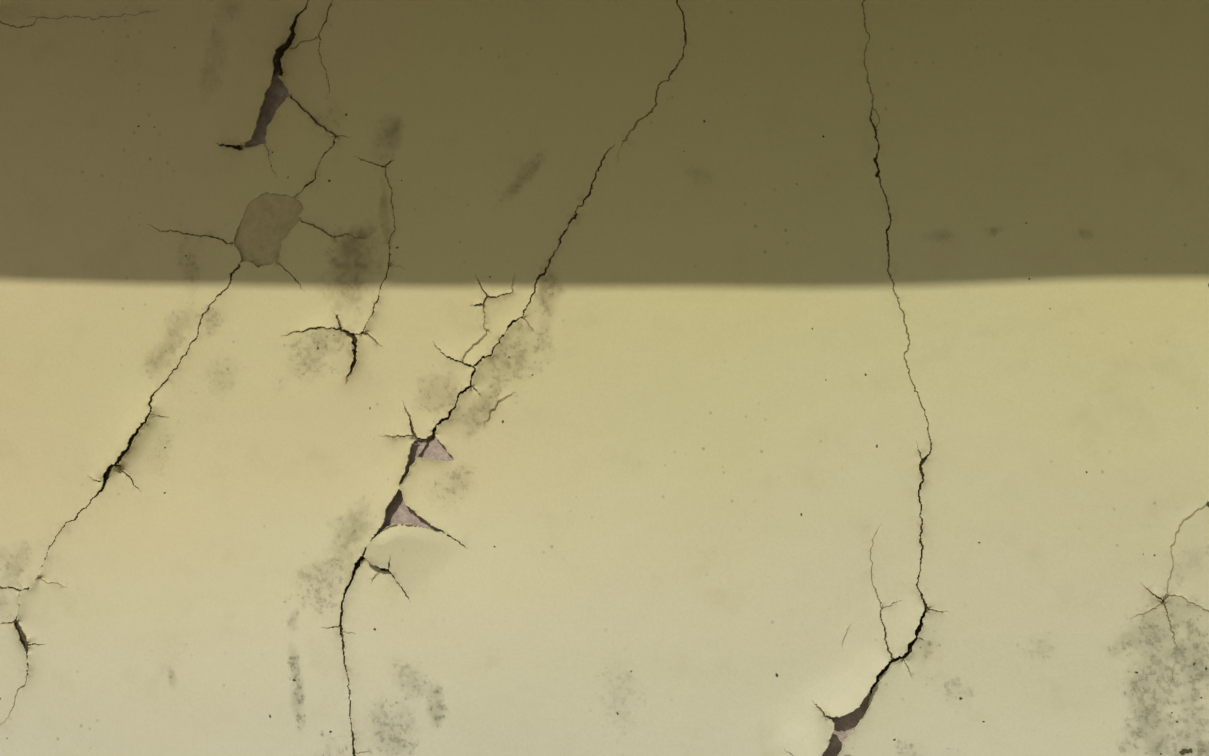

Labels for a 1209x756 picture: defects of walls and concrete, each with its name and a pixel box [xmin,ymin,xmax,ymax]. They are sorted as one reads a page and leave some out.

crack [0,10,161,28]
peeling [212,0,321,175]
crack [278,0,411,393]
crack [425,0,696,434]
crack [839,0,948,679]
crack [0,224,251,725]
crack [314,540,380,756]
peeling [335,400,472,602]
peeling [761,608,940,756]
crack [1132,497,1209,683]